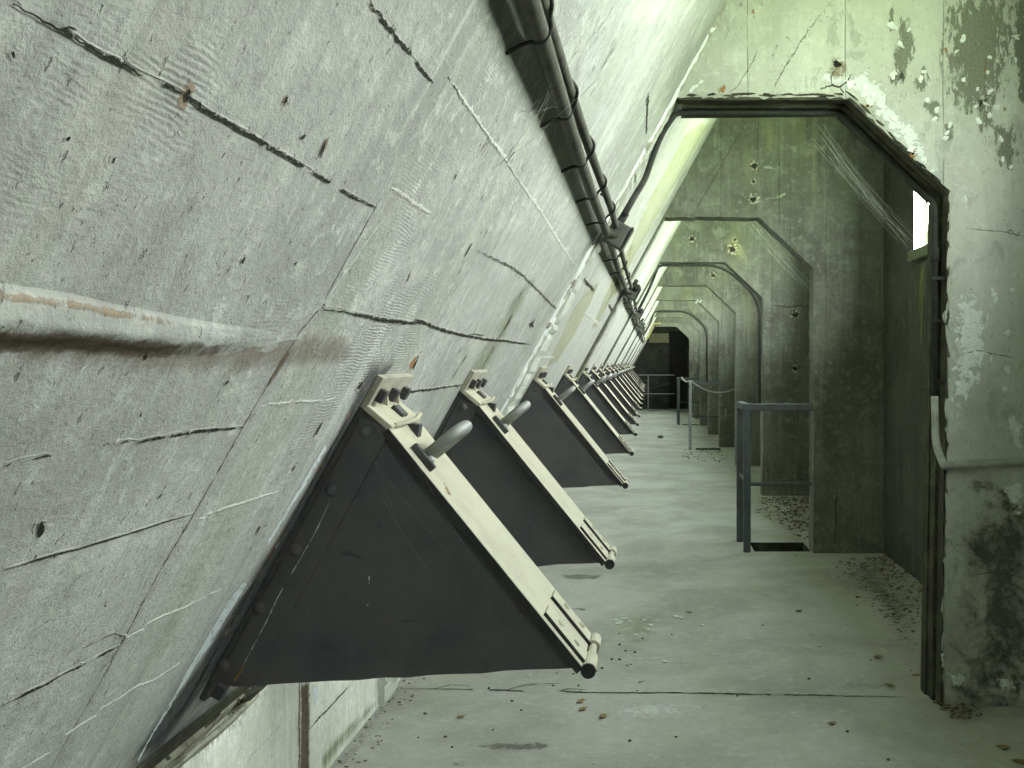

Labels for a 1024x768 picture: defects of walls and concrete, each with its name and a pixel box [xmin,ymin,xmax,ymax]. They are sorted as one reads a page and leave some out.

crack [12,0,376,208]
crack [370,0,434,84]
peeling [886,0,1024,170]
spalling [500,1,954,413]
crack [322,250,557,345]
crack [103,425,243,446]
crack [4,512,193,570]
damp [941,477,1024,706]
crack [2,633,128,707]